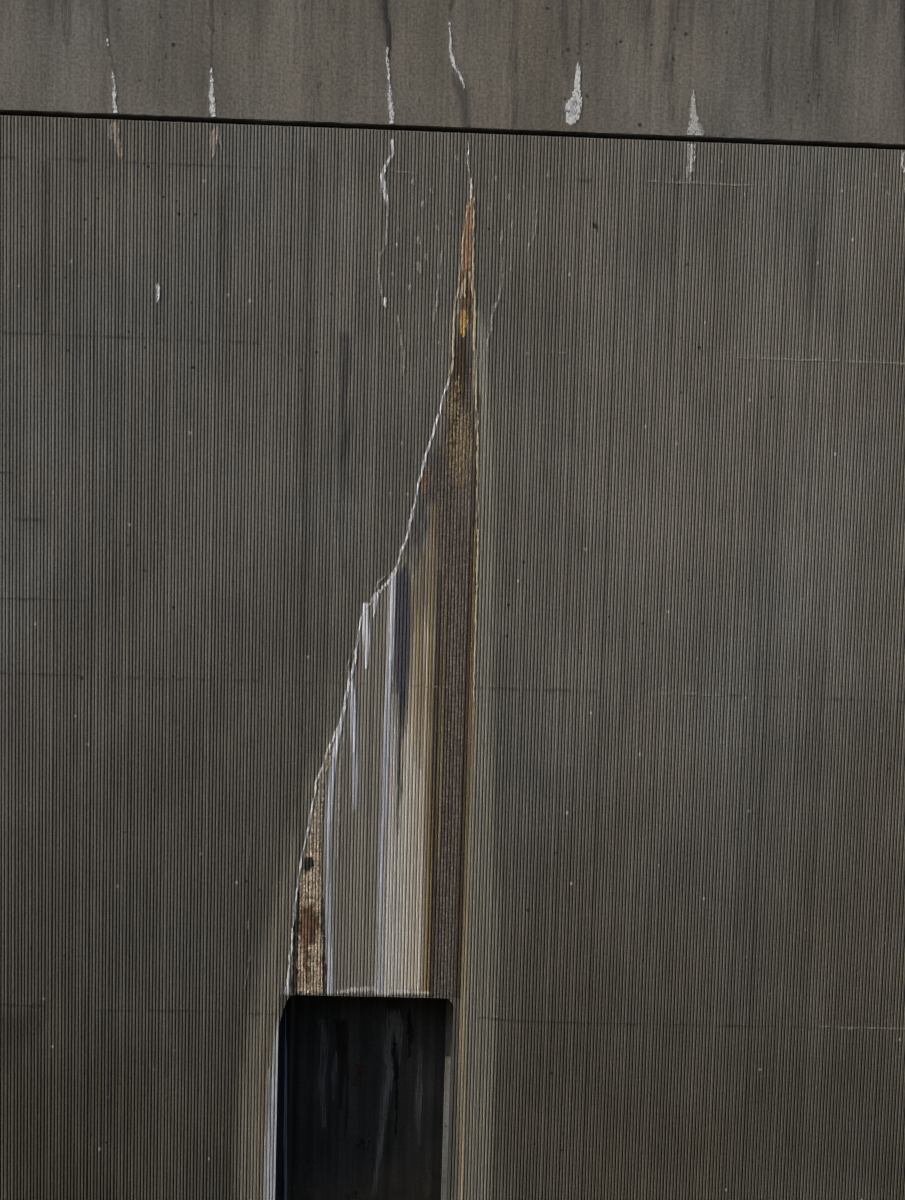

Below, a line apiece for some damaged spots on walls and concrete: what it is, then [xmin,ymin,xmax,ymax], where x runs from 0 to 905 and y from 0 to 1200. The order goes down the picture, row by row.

leakage [109,71,123,159]
leakage [209,68,222,158]
leakage [449,22,466,126]
leakage [688,144,696,183]
corrosion [458,185,475,338]
leakage [260,185,501,1200]
spalling [290,742,332,995]